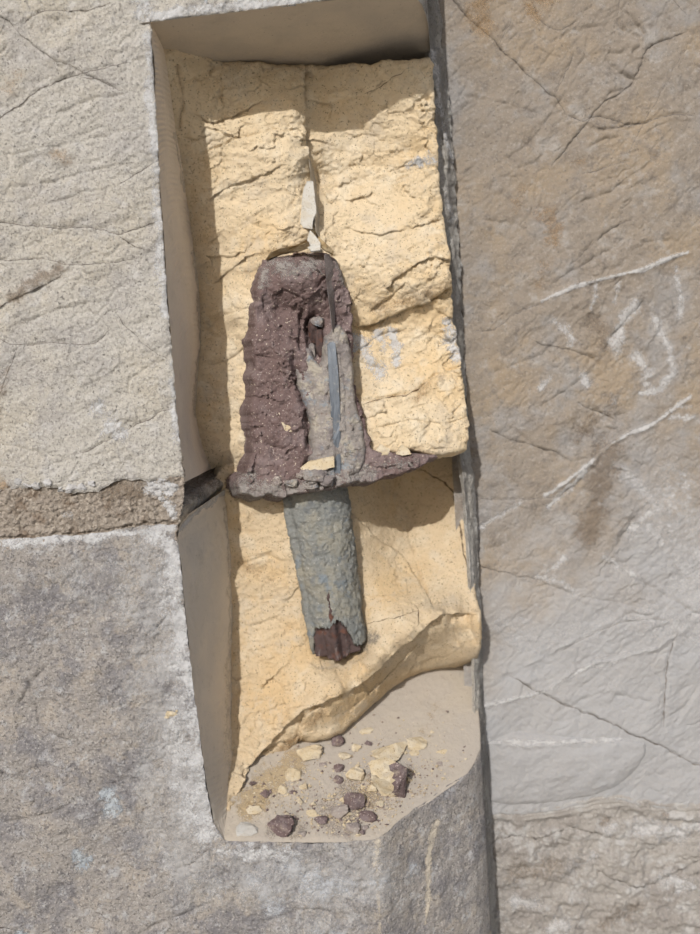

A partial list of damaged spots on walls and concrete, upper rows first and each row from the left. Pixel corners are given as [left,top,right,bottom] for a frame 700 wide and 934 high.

crack [0,3,129,118]
crack [453,0,694,173]
crack [0,221,157,307]
peeling [266,230,334,260]
crack [0,309,170,393]
crack [461,305,537,417]
crack [78,409,170,454]
spalling [300,456,335,470]
spalling [376,444,411,456]
crack [459,524,563,590]
corrosion [314,592,361,662]
crack [511,619,699,765]